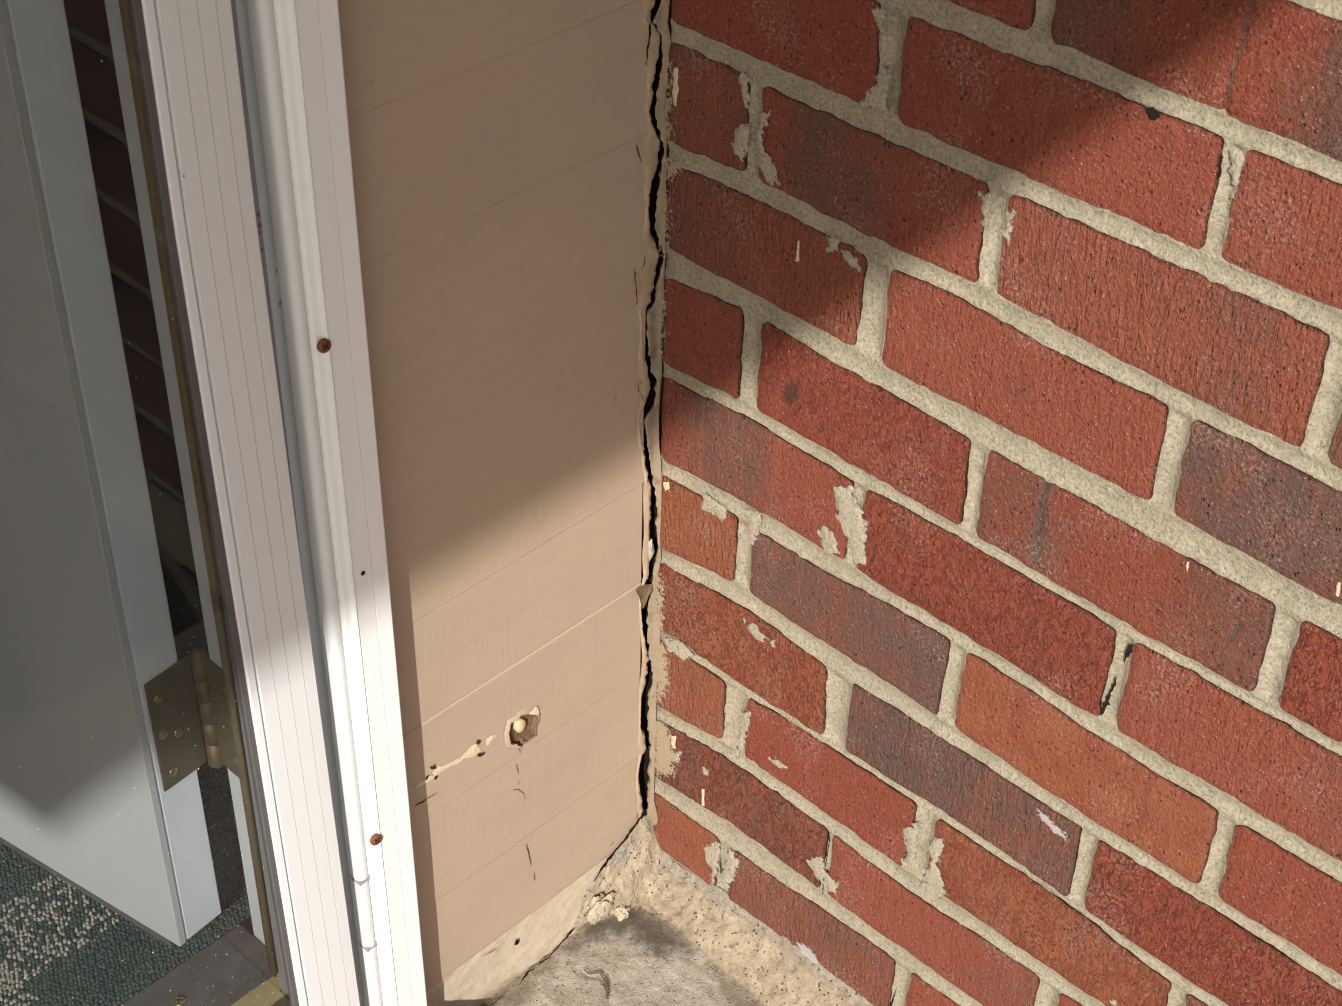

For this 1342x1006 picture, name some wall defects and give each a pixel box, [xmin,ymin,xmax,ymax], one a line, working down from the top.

peeling [416,707,539,788]
crack [594,0,667,881]